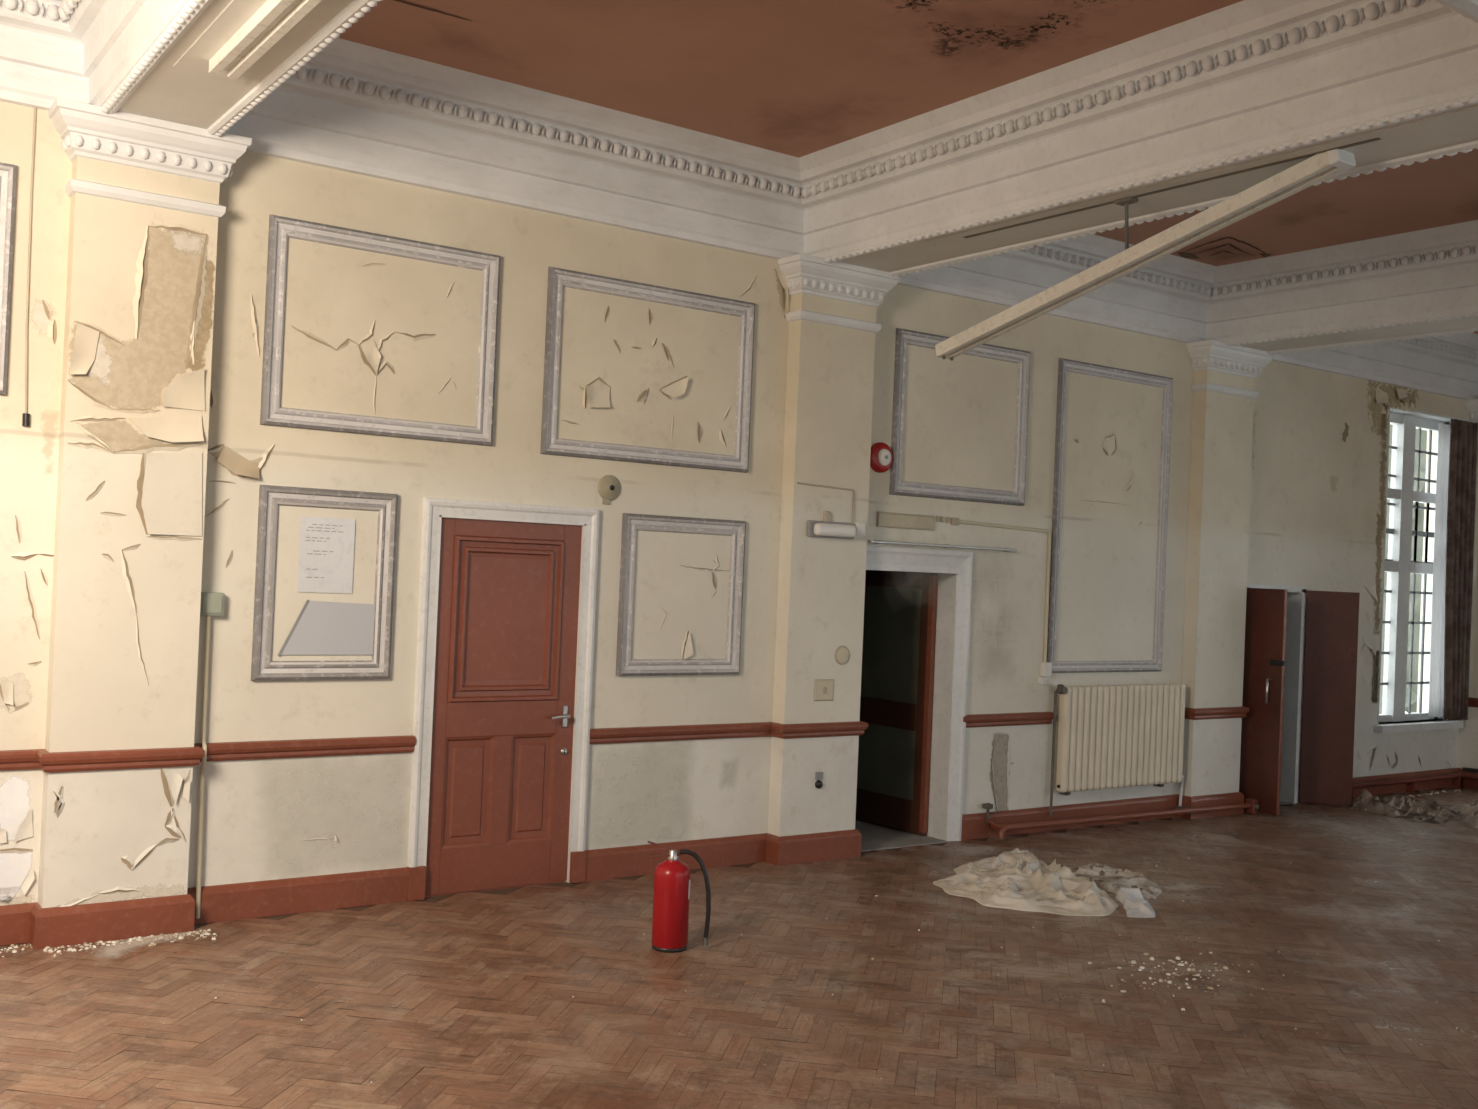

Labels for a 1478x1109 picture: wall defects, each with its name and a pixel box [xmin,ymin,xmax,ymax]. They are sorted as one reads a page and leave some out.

leakage [932,13,1069,54]
peeling [32,224,275,541]
crack [250,295,436,415]
peeling [1368,381,1418,434]
crack [86,481,149,686]
peeling [0,673,31,712]
flaking render [0,776,35,906]
peeling [121,768,190,870]
flaking render [990,733,1014,811]
flaking render [59,885,185,907]